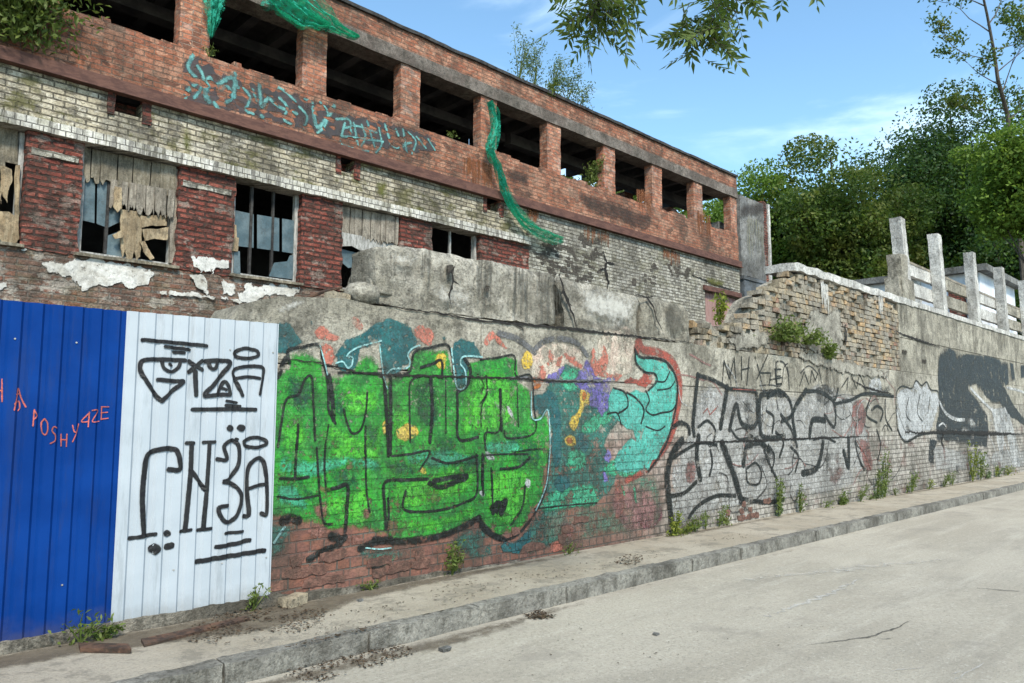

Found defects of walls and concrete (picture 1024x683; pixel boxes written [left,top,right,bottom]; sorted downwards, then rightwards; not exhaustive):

peeling [42,256,300,304]
crack [377,262,696,344]